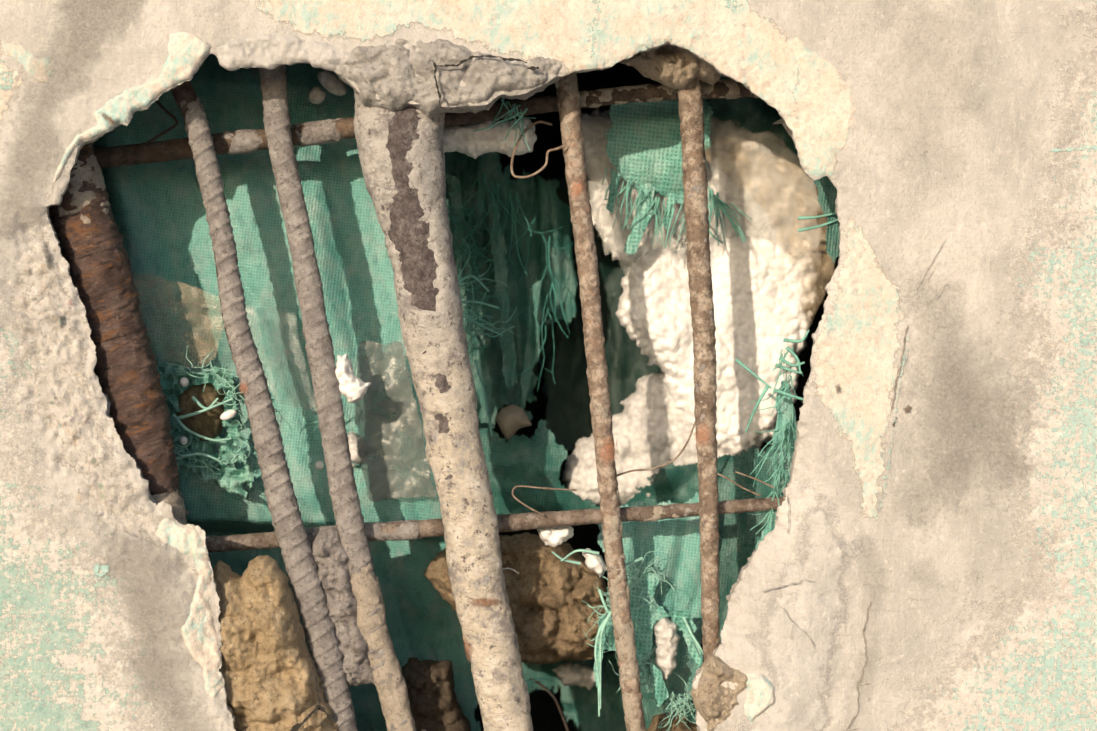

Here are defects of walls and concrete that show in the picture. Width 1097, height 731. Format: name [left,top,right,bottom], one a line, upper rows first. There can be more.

crack [433,55,539,108]
spalling [0,0,856,731]
flaking render [799,198,912,520]